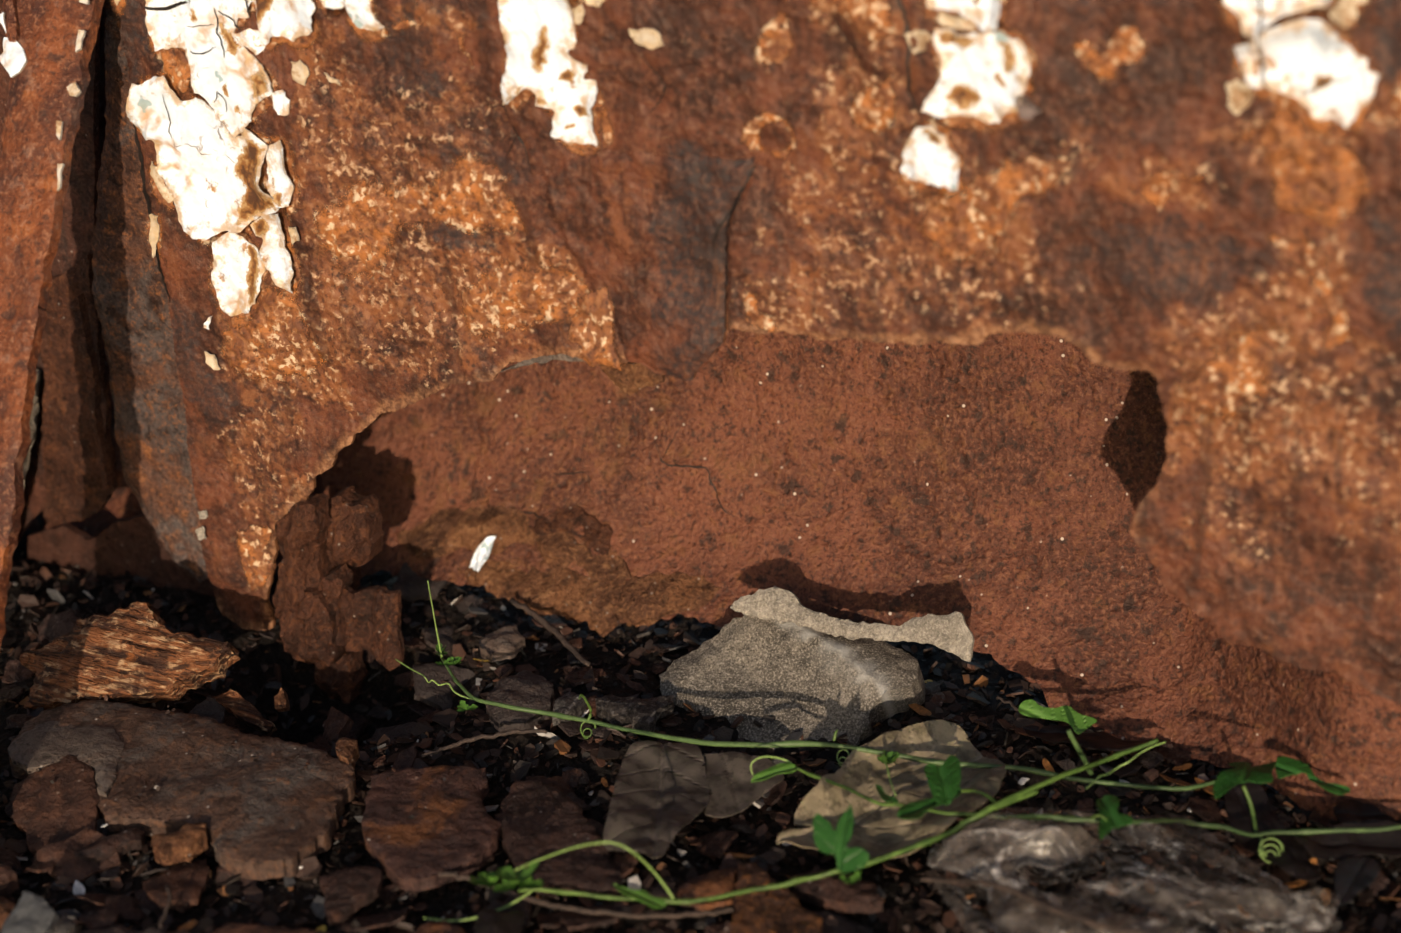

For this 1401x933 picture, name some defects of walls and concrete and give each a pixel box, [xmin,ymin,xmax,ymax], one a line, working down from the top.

rust [811,0,895,41]
peeling [899,0,1042,196]
peeling [1218,0,1380,142]
peeling [126,0,388,330]
rust [313,150,525,278]
peeling [497,0,756,381]
rust [918,155,1070,263]
rust [461,260,665,396]
rust [1175,317,1293,422]
peeling [469,535,496,572]
rust [397,505,722,638]
peeling [730,587,974,662]